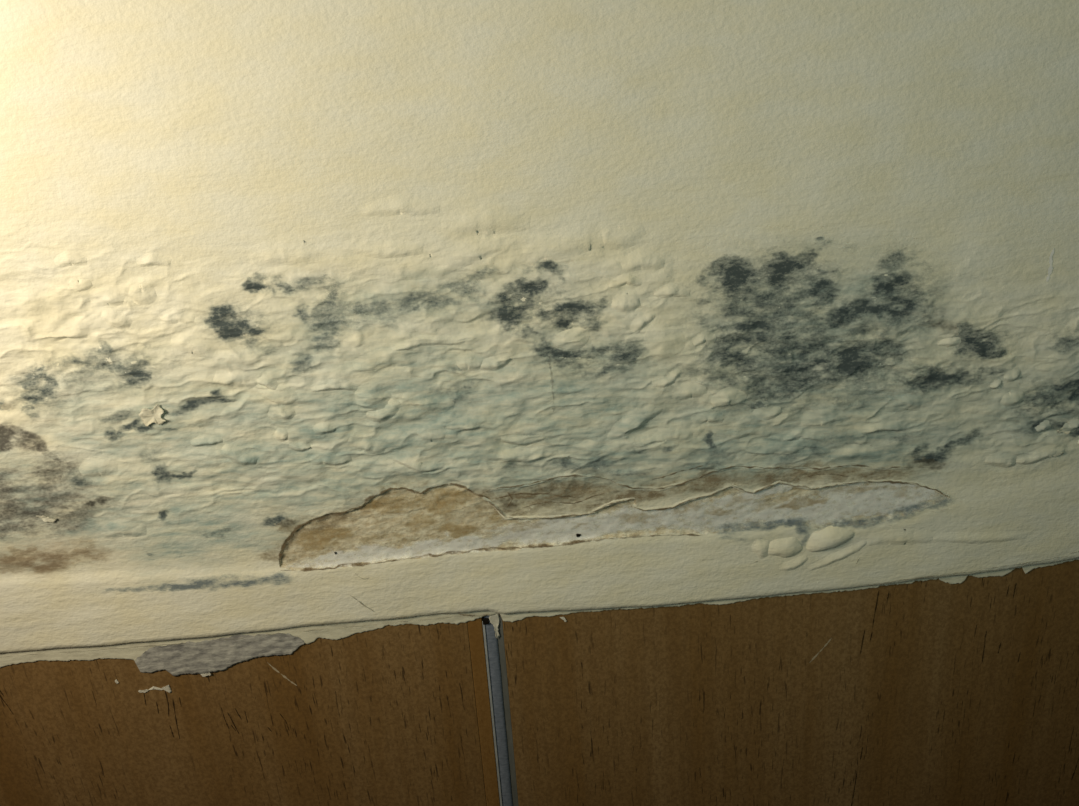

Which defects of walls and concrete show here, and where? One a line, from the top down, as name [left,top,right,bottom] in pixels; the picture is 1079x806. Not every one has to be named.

water stain [204,305,265,347]
water stain [242,277,344,371]
water stain [490,261,643,376]
water stain [698,237,933,408]
water stain [73,346,151,385]
water stain [901,322,1006,392]
water stain [0,426,45,451]
water stain [19,368,58,417]
water stain [103,413,151,441]
water stain [175,390,231,415]
flaking render [279,479,951,570]
water stain [123,574,285,591]